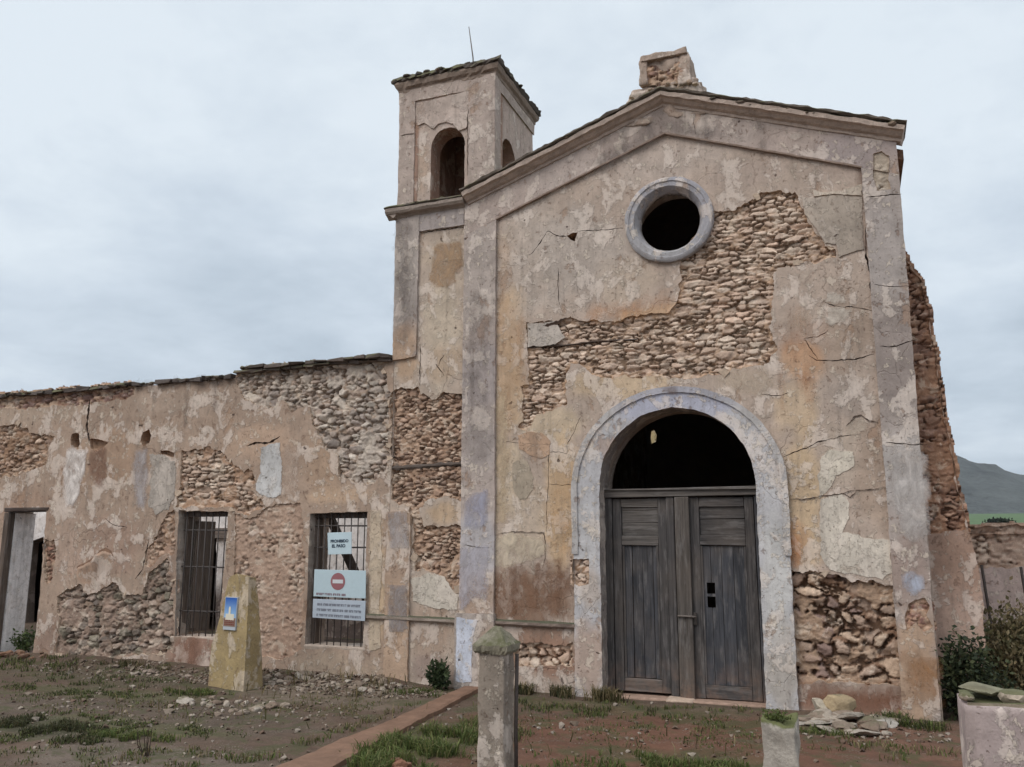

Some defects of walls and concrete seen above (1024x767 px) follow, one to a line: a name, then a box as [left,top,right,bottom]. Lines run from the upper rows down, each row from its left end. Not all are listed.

flaking render [714,184,864,258]
crack [804,194,914,361]
crack [83,400,91,444]
flaking render [123,429,232,596]
flaking render [214,502,310,660]
flaking render [380,387,545,683]
flaking render [518,320,565,432]
crack [797,487,886,500]
crack [784,415,927,457]
peeling [893,450,928,534]